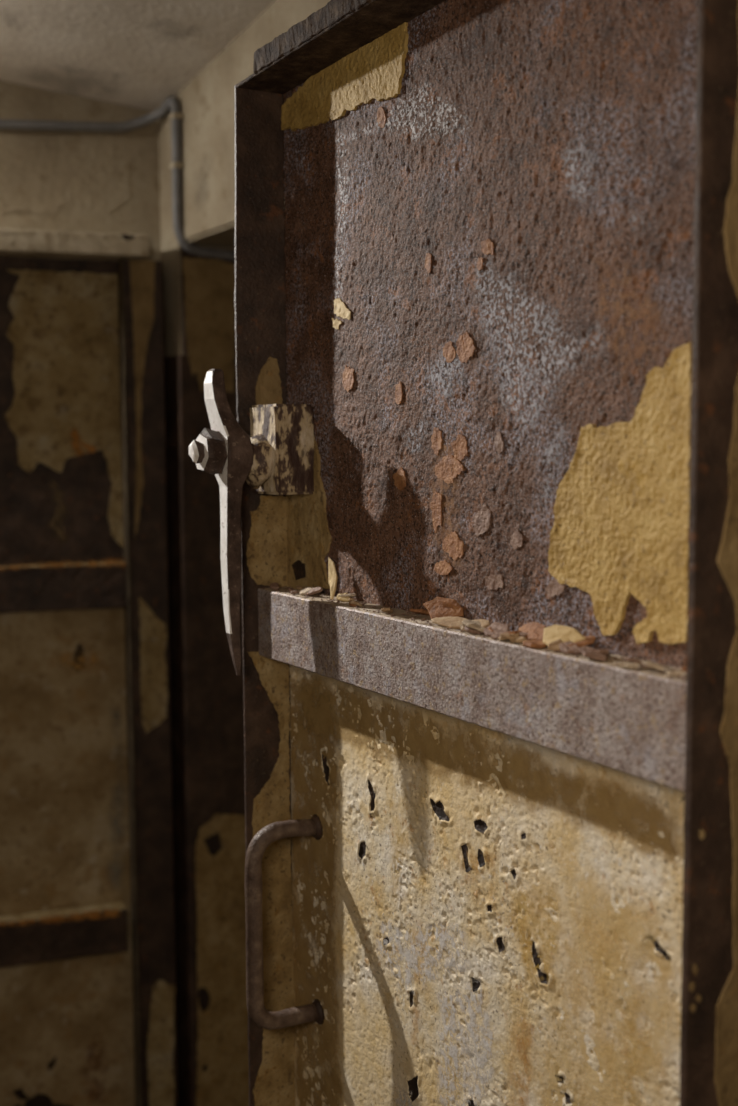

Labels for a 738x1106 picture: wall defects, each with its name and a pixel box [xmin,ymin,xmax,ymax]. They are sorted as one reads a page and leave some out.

rust [443,332,476,363]
rust [342,365,355,392]
peeling [4,260,155,548]
rust [430,427,468,575]
rust [474,503,491,537]
rust [484,574,504,590]
rust [423,597,466,629]
spalling [368,780,376,811]
spalling [430,798,450,821]
spalling [474,819,488,834]
spalling [358,842,366,859]
spalling [461,844,485,872]